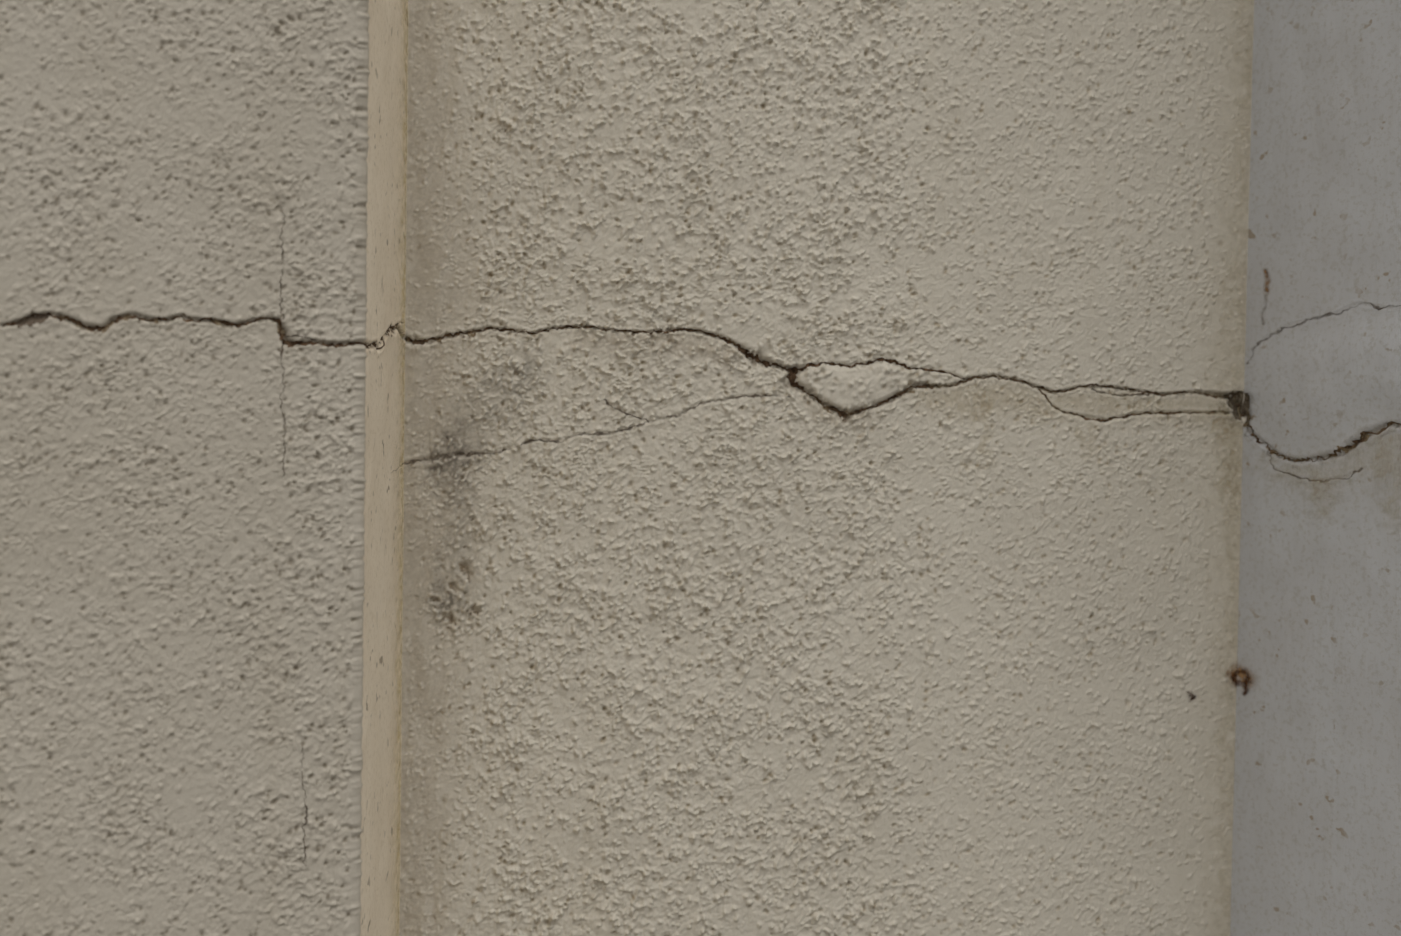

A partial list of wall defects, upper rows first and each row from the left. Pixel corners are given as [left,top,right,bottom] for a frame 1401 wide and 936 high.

crack [2,219,1401,482]
corrosion [1227,668,1252,695]